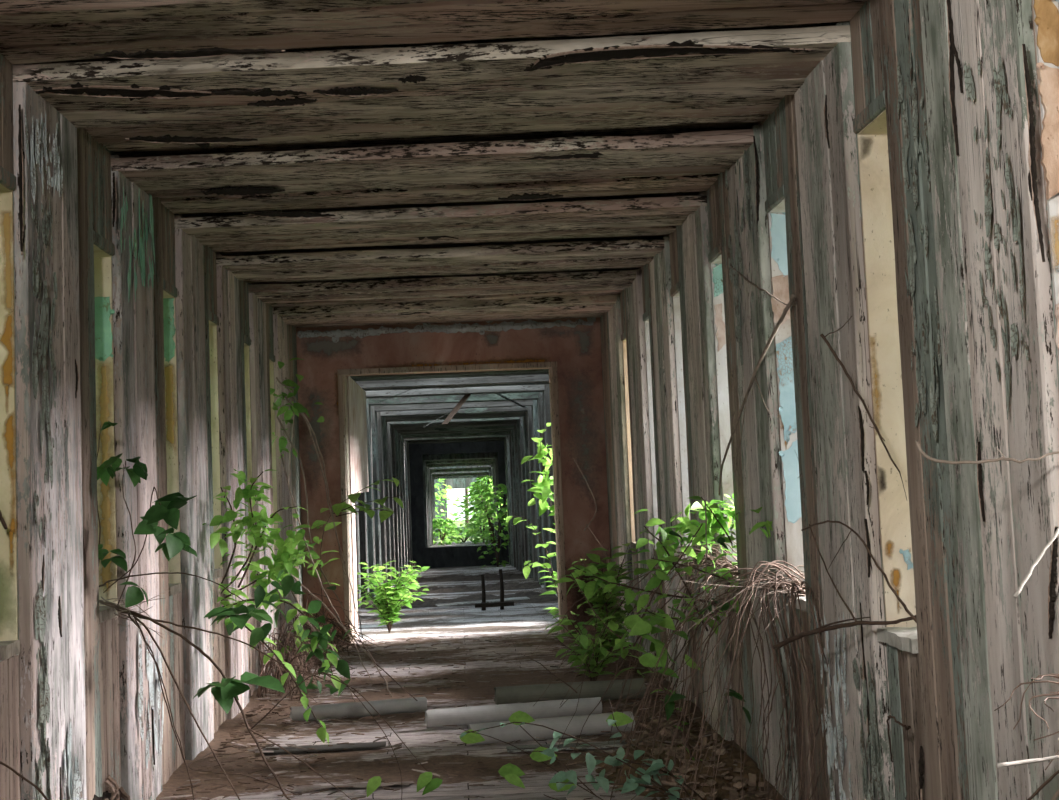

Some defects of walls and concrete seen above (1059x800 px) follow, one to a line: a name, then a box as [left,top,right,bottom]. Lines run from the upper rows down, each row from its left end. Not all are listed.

crack [946,0,963,156]
flaking render [1033,0,1059,200]